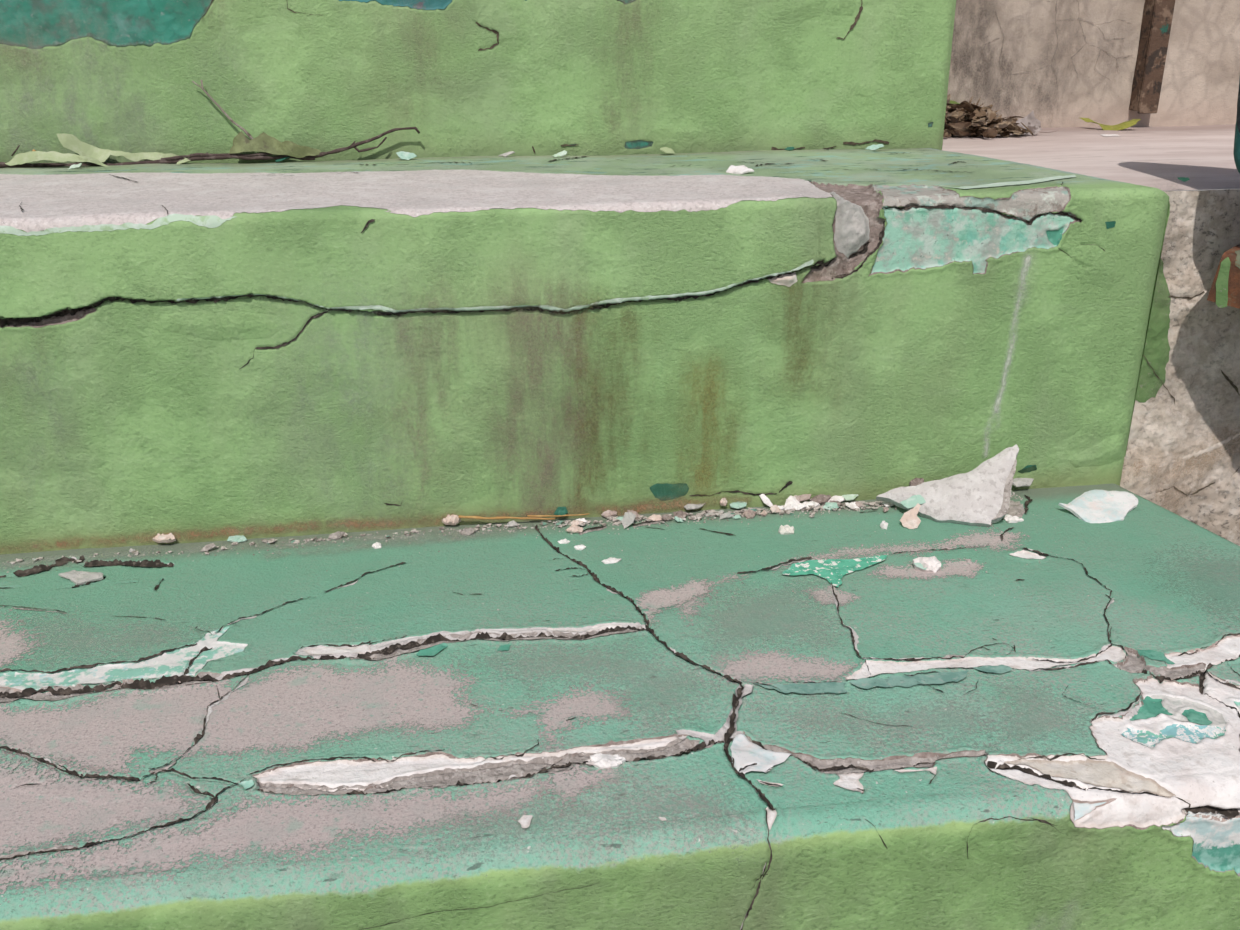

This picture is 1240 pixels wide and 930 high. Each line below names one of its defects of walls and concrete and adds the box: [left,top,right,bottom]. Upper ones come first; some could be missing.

peeling [0,0,212,49]
peeling [339,0,452,10]
crack [476,22,499,51]
crack [836,0,863,40]
peeling [0,131,1079,313]
crack [0,182,1106,369]
crack [689,481,793,496]
crack [831,495,1240,722]
peeling [0,478,1240,906]
crack [0,520,936,930]
crack [987,753,1239,818]
crack [967,816,1061,857]